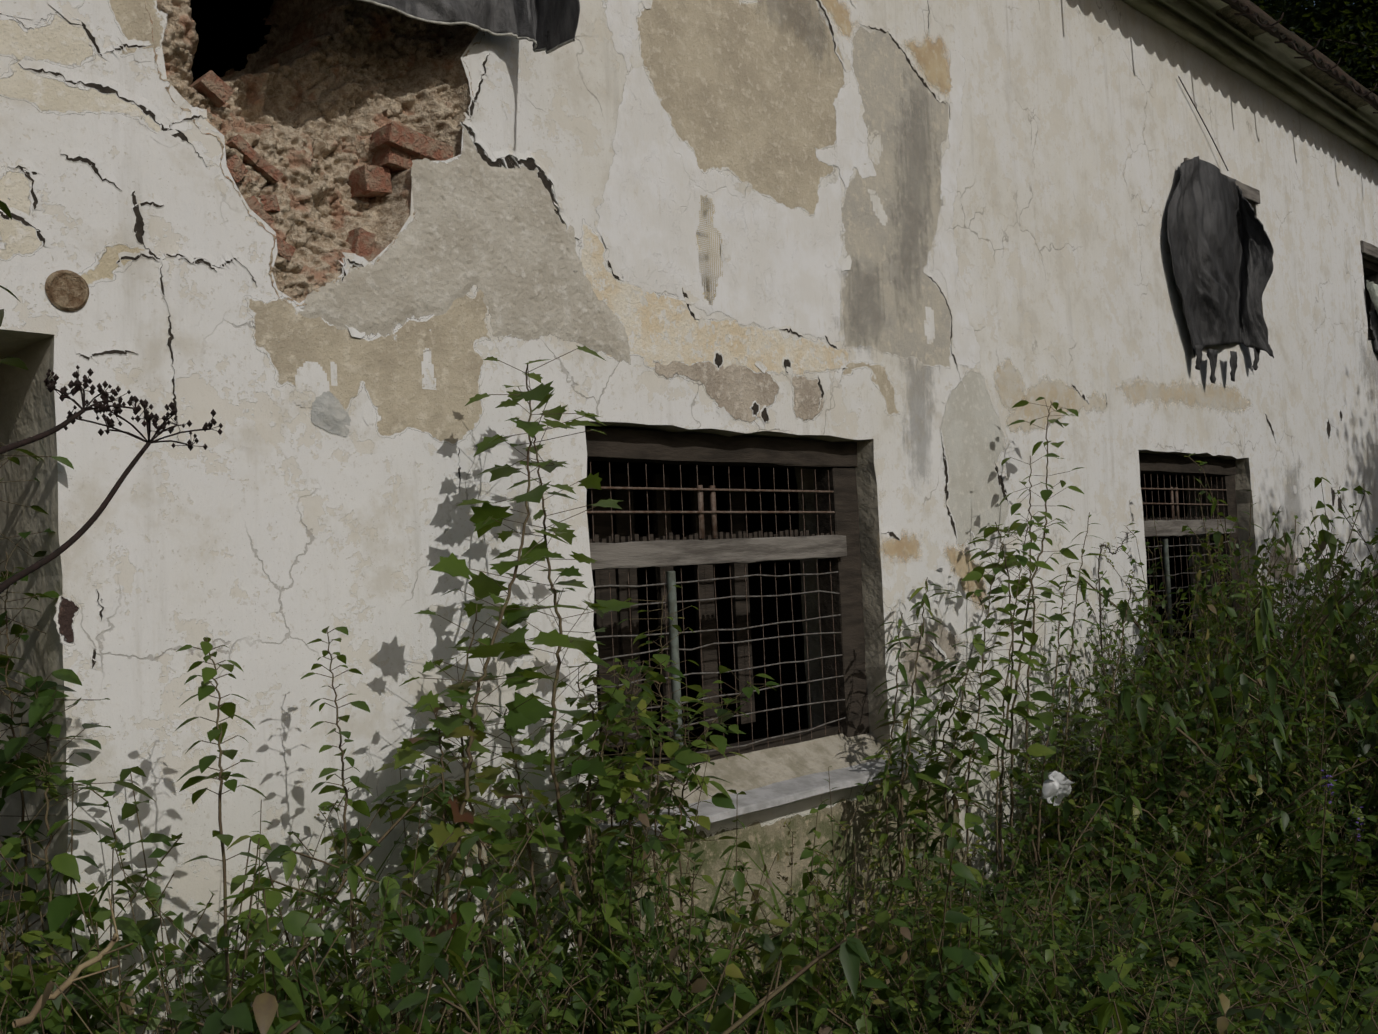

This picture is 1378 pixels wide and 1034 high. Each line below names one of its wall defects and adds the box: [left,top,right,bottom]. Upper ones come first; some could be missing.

crack [0,9,214,167]
peeling [0,166,43,261]
flaking render [78,242,148,287]
crack [0,145,263,441]
spalling [108,0,1009,547]
flaking render [54,596,80,646]
crack [86,586,113,671]